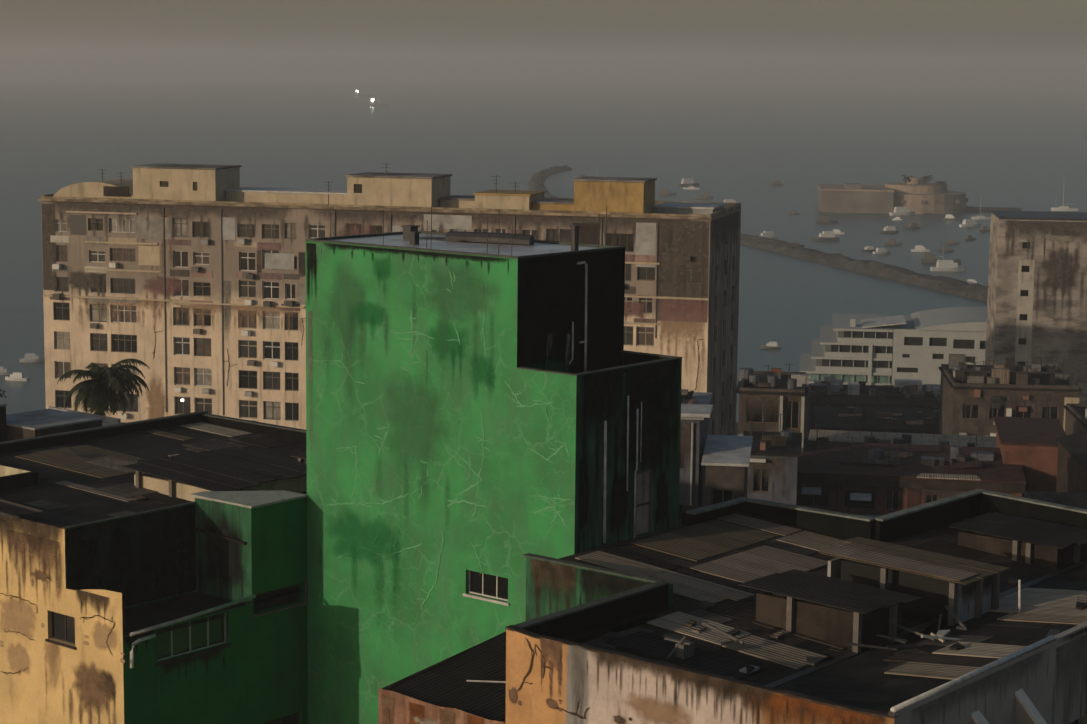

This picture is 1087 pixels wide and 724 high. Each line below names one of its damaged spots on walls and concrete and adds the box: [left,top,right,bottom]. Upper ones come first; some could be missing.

leakage [1007,221,1087,308]
crack [390,270,573,528]
leakage [578,321,704,553]
leakage [0,505,243,616]
crack [326,413,491,612]
leakage [69,664,115,724]
leakage [540,637,884,724]